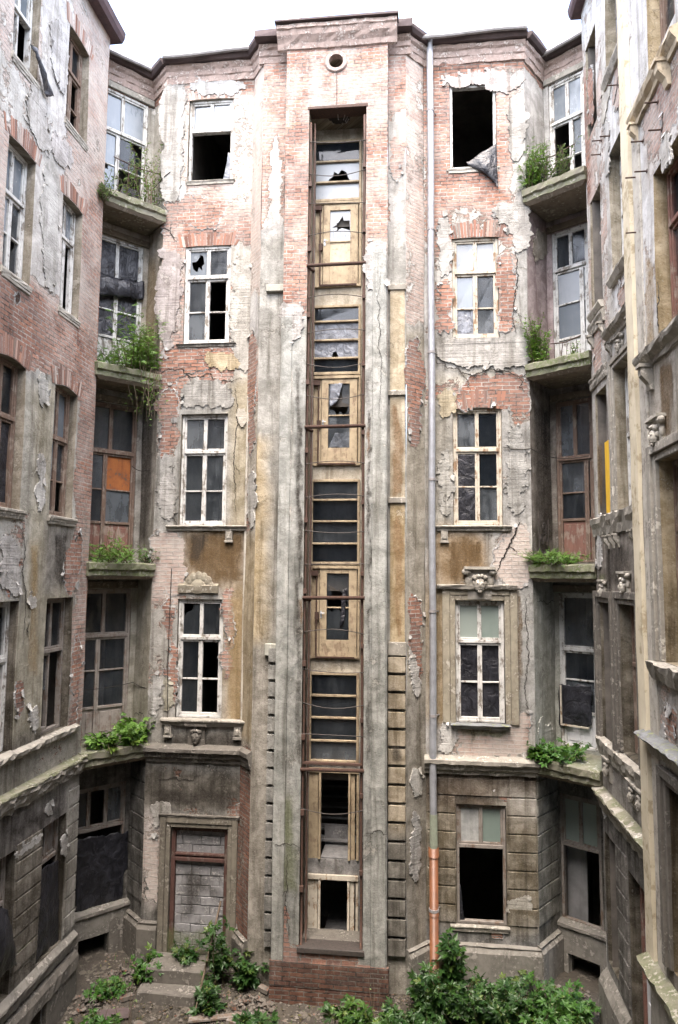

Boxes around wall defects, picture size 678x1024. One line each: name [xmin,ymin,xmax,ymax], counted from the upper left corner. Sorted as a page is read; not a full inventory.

flaking render [48,19,70,95]
flaking render [441,67,531,162]
flaking render [25,83,74,293]
flaking render [152,76,258,529]
flaking render [435,201,547,590]
flaking render [0,534,37,609]
leakage [190,536,241,578]
crack [497,522,520,571]
flaking render [409,766,425,797]
flaking render [143,801,171,904]
flaking render [409,811,422,883]